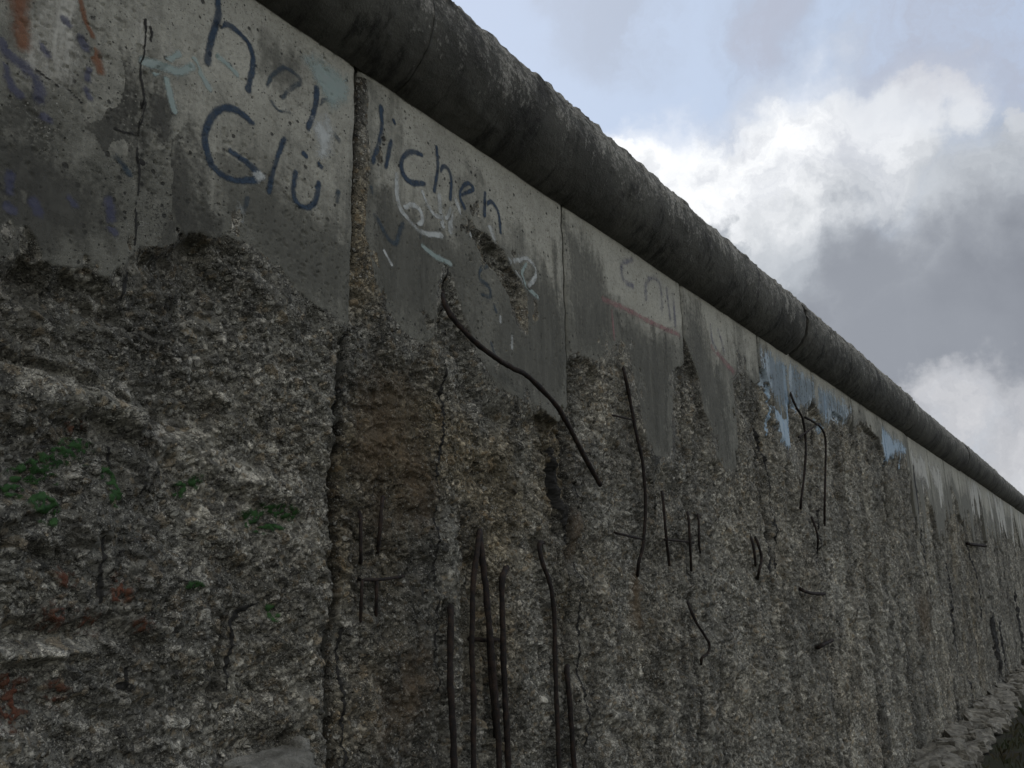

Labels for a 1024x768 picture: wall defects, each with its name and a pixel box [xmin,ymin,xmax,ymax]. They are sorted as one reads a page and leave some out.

crack [114,18,153,245]
spalling [0,77,603,768]
spalling [556,329,1024,768]